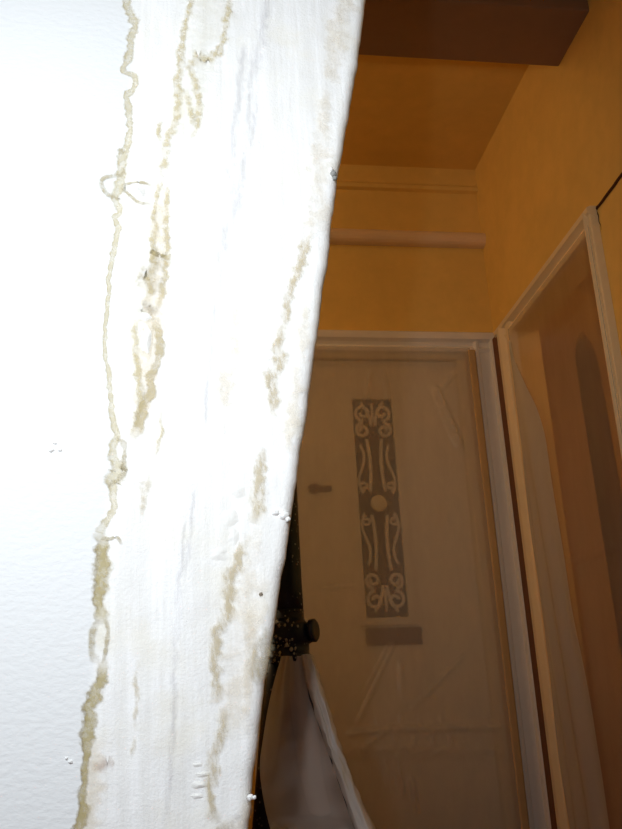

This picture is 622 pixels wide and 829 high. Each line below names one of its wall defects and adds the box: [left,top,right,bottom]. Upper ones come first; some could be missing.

water stain [120,3,138,112]
water stain [100,125,147,202]
water stain [102,210,126,525]
water stain [134,354,157,428]
water stain [155,330,163,355]
water stain [93,536,120,610]
water stain [73,674,107,829]